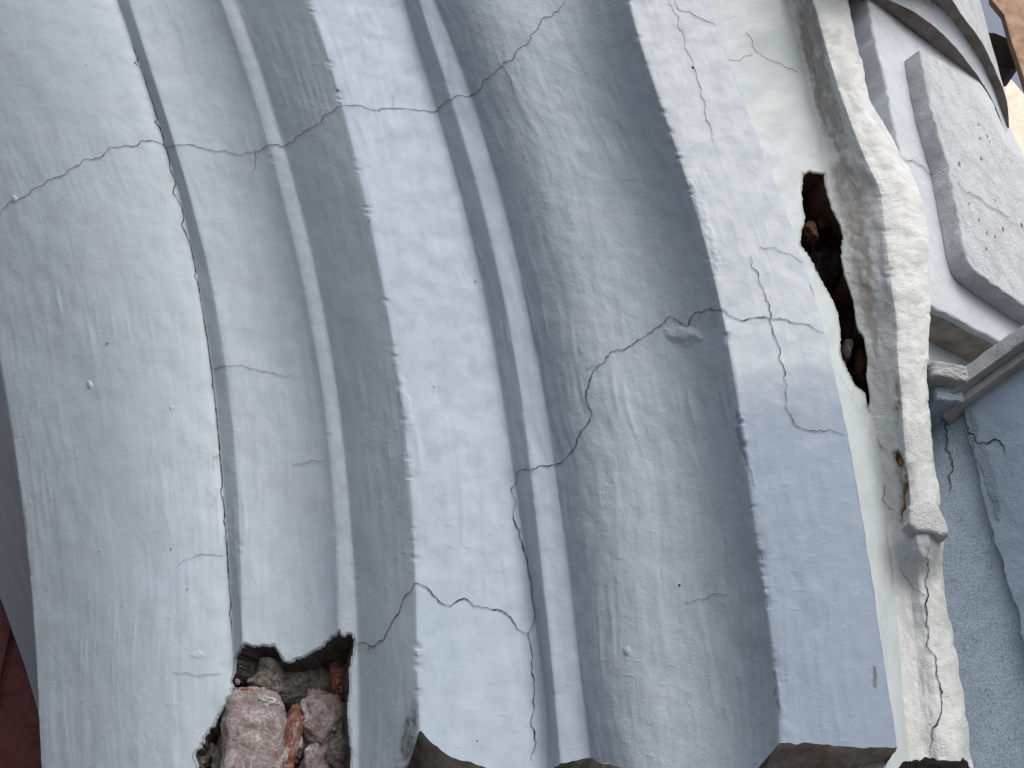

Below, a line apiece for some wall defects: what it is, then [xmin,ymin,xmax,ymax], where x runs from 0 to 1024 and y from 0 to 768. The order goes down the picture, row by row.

crack [669,1,715,140]
crack [1,0,565,629]
spalling [799,169,871,413]
crack [355,247,845,761]
crack [944,422,1005,491]
spalling [192,628,357,768]
crack [899,546,943,760]